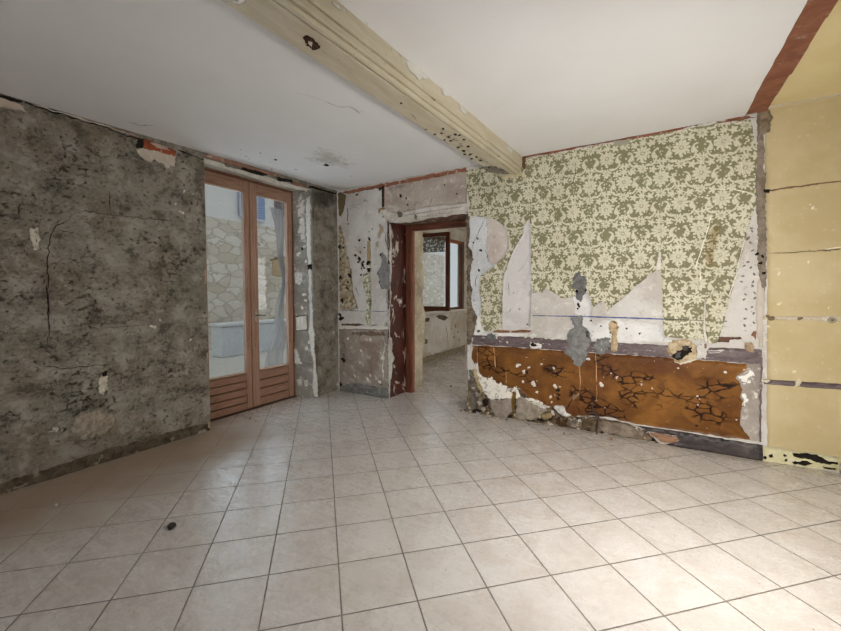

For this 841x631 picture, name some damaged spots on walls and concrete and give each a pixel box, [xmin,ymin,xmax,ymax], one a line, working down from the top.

spalling [0,95,26,112]
spalling [135,138,176,168]
flaking render [204,155,467,270]
crack [46,195,176,369]
flaking render [423,216,494,354]
spalling [667,338,698,369]
spalling [464,363,659,443]